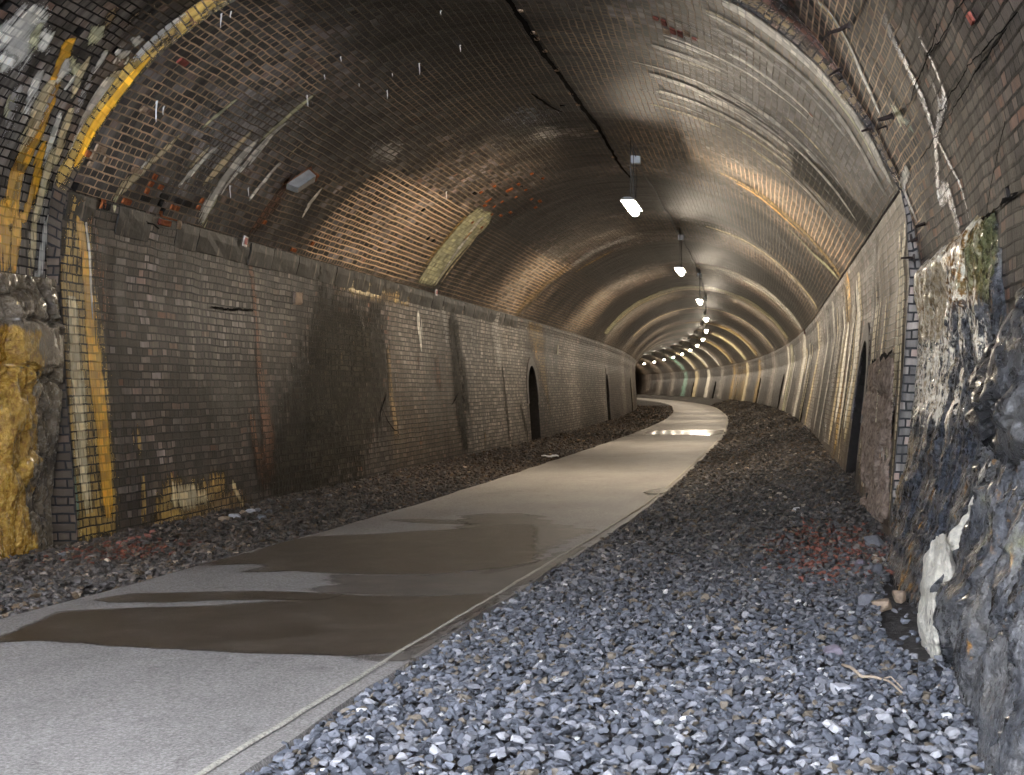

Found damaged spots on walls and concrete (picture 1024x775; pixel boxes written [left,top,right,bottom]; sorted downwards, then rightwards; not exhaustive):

crack [505,0,630,178]
crack [902,0,965,110]
crack [920,12,1018,160]
spalling [84,143,110,167]
spalling [99,166,205,230]
crack [981,121,1018,221]
crack [212,304,253,312]
leakage [262,277,427,498]